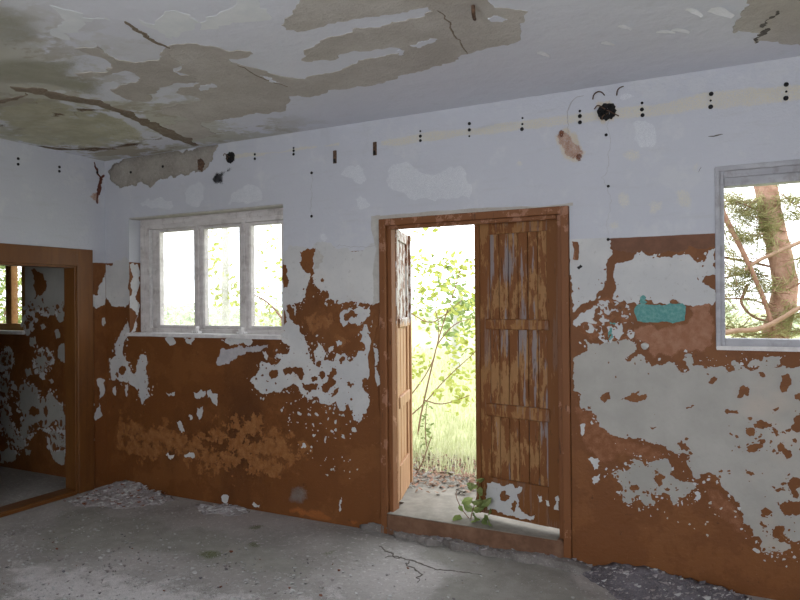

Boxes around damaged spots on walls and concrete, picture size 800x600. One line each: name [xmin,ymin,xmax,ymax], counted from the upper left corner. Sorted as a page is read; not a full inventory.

crack [124,21,170,49]
crack [438,11,468,54]
spalling [753,11,780,43]
crack [0,86,199,146]
water stain [615,85,800,120]
spalling [108,145,218,188]
peeling [93,257,154,420]
peeling [165,337,195,346]
peeling [0,267,65,465]
peeling [569,238,800,567]
peeling [116,389,313,479]
crack [380,546,480,582]